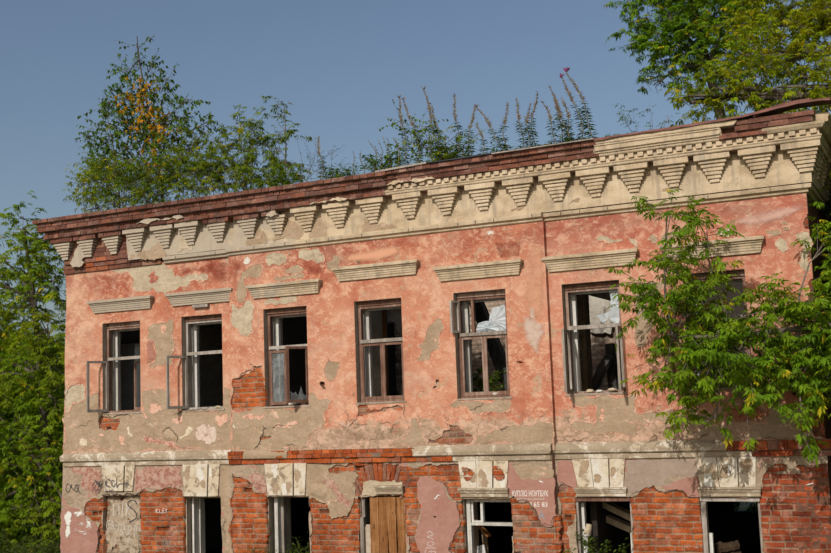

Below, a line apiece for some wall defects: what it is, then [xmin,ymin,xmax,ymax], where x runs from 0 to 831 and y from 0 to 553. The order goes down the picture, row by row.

flaking render [32,140,599,337]
peeling [147,318,176,368]
peeling [417,318,444,361]
peeling [449,399,511,415]
peeling [62,358,474,553]
peeling [428,420,555,445]
flaking render [492,466,505,481]
peeling [513,463,554,480]
flaking render [695,391,831,553]
flaking render [510,483,577,553]
flaking render [631,486,704,553]